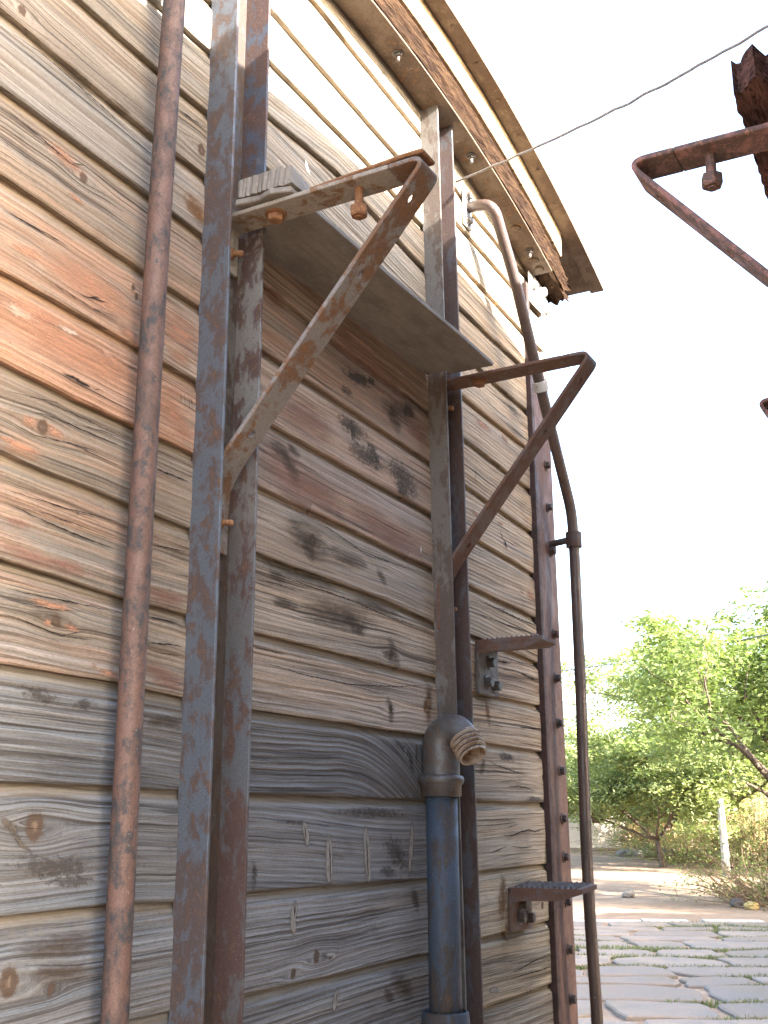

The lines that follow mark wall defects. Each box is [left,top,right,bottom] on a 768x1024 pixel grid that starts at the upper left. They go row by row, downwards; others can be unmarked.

rust [188,195,202,221]
leakage [342,371,374,395]
leakage [338,415,417,497]